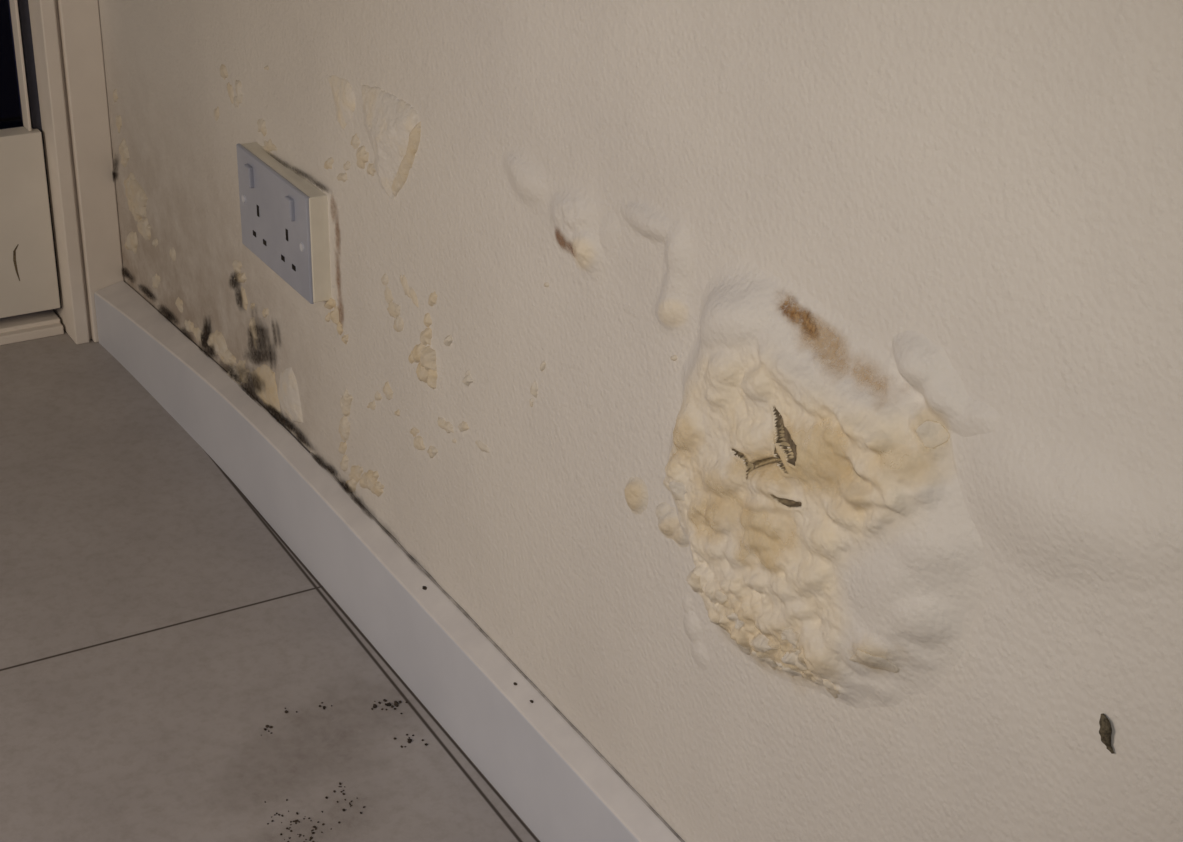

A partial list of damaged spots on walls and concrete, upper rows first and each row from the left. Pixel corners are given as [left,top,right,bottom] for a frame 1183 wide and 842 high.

peeling [408,291,453,389]
damp [122,268,370,517]
crack [732,407,802,508]